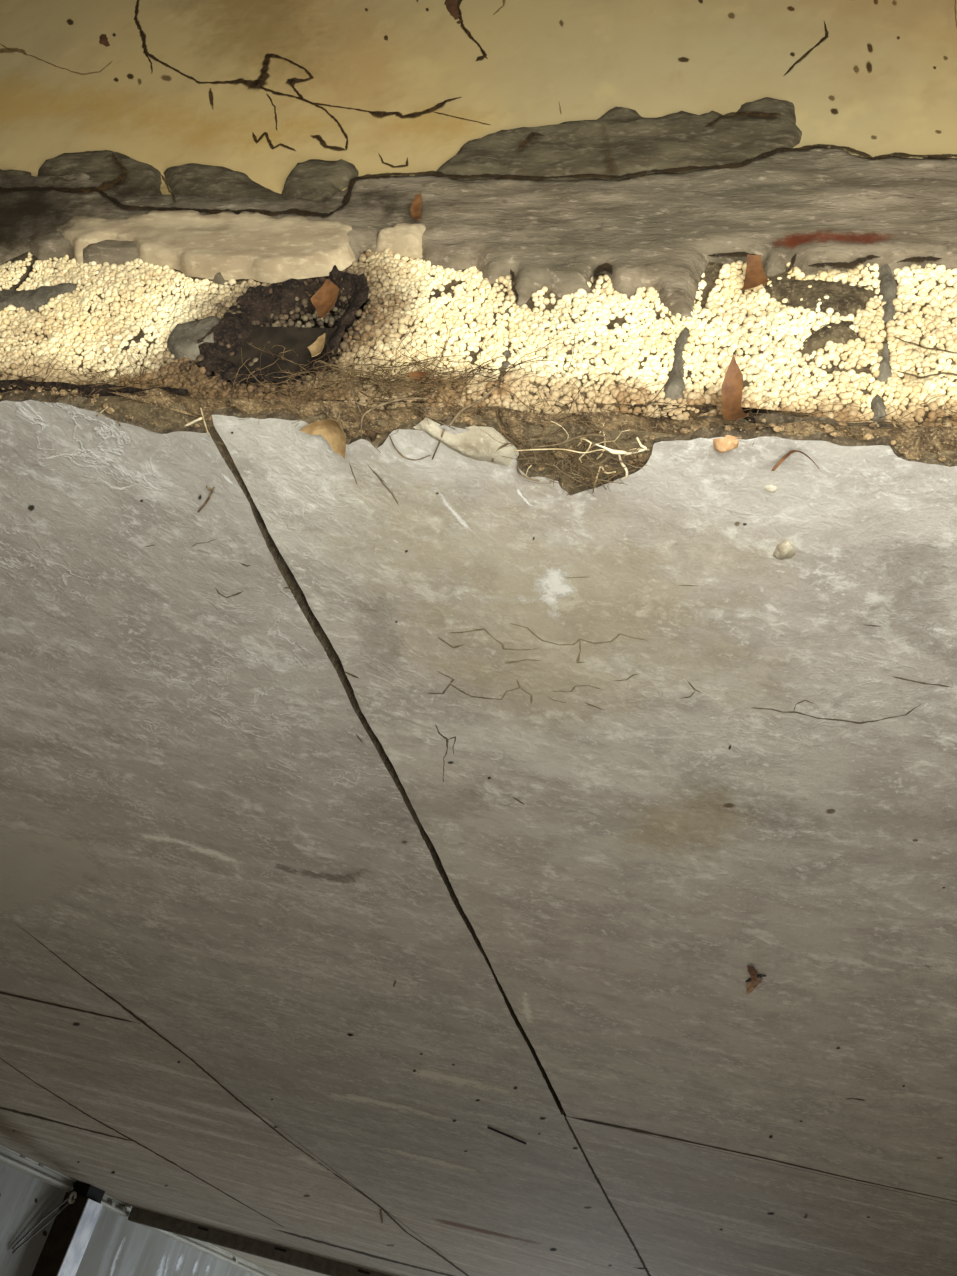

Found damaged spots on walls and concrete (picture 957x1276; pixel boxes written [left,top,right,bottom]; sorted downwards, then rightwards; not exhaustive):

crack [0,0,957,218]
spalling [0,248,957,490]
crack [349,463,399,505]
crack [215,562,250,598]
crack [427,623,648,711]
crack [435,724,456,782]